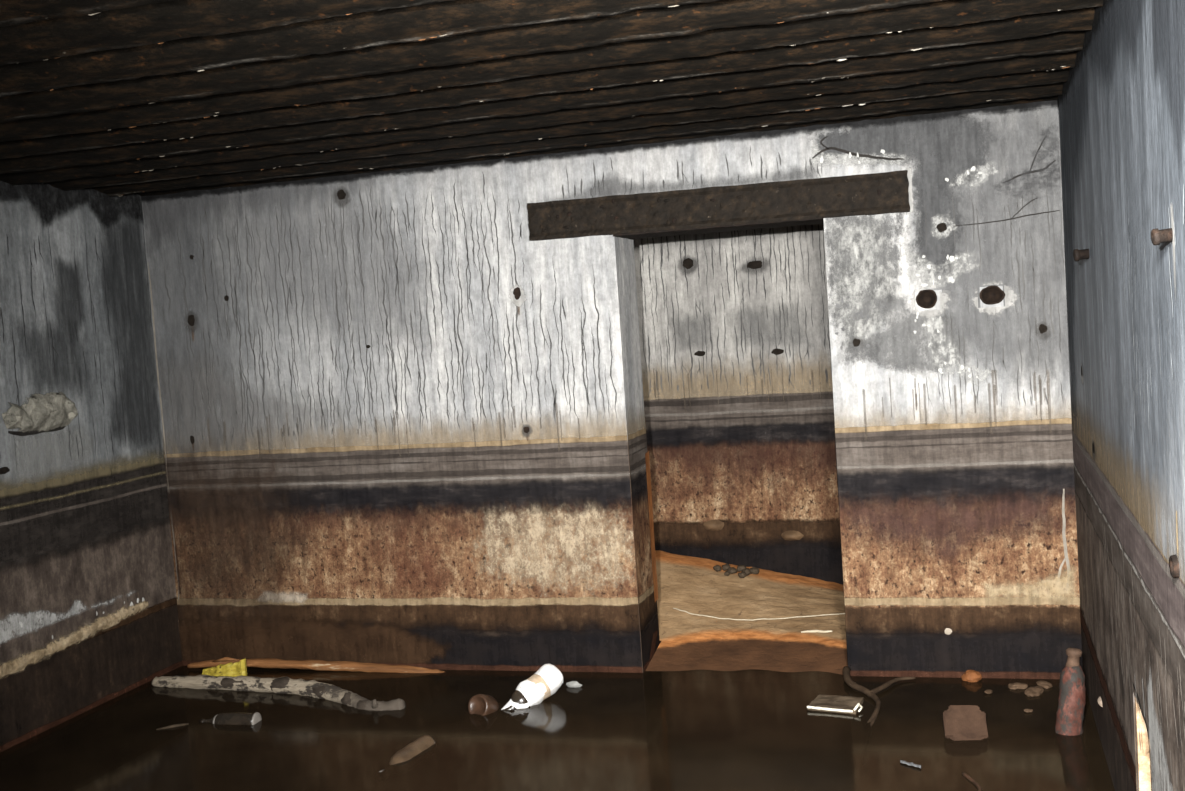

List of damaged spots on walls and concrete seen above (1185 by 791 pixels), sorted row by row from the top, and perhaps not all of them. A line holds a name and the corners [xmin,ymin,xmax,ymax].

peeling [812,115,997,386]
spalling [973,282,1017,315]
water stain [939,0,1142,402]
water stain [0,195,1185,791]
corrosion [170,440,1136,788]